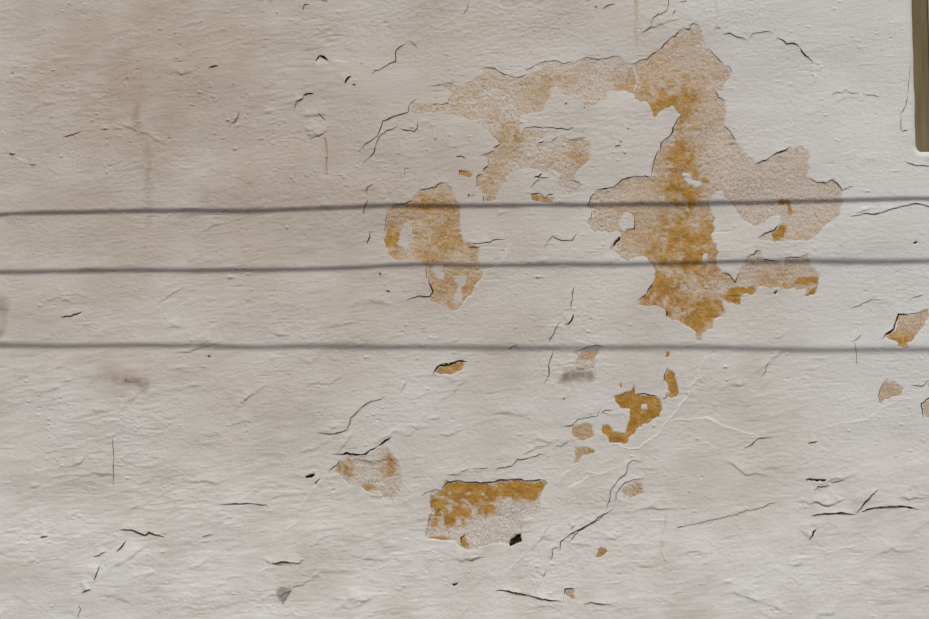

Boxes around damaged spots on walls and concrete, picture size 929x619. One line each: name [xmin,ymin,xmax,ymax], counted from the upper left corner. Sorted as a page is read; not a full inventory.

crack [361,99,437,162]
peeling [410,23,842,341]
crack [854,203,929,216]
peeling [384,182,483,310]
peeling [883,309,929,348]
crack [322,383,406,435]
flaking render [433,360,467,374]
peeling [569,352,679,463]
peeling [878,380,929,404]
peeling [329,437,402,500]
flaking render [421,478,547,550]
crack [810,491,915,539]